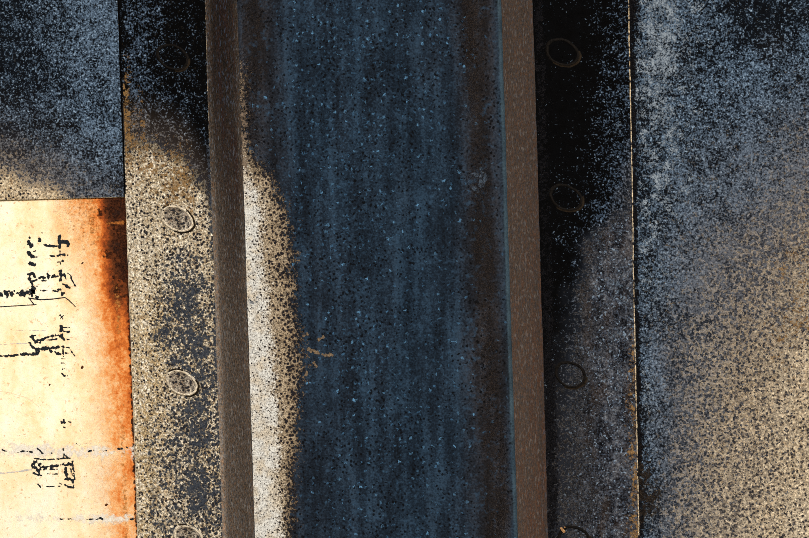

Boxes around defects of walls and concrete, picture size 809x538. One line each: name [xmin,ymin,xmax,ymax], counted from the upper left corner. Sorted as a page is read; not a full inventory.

corrosion [65,197,138,538]